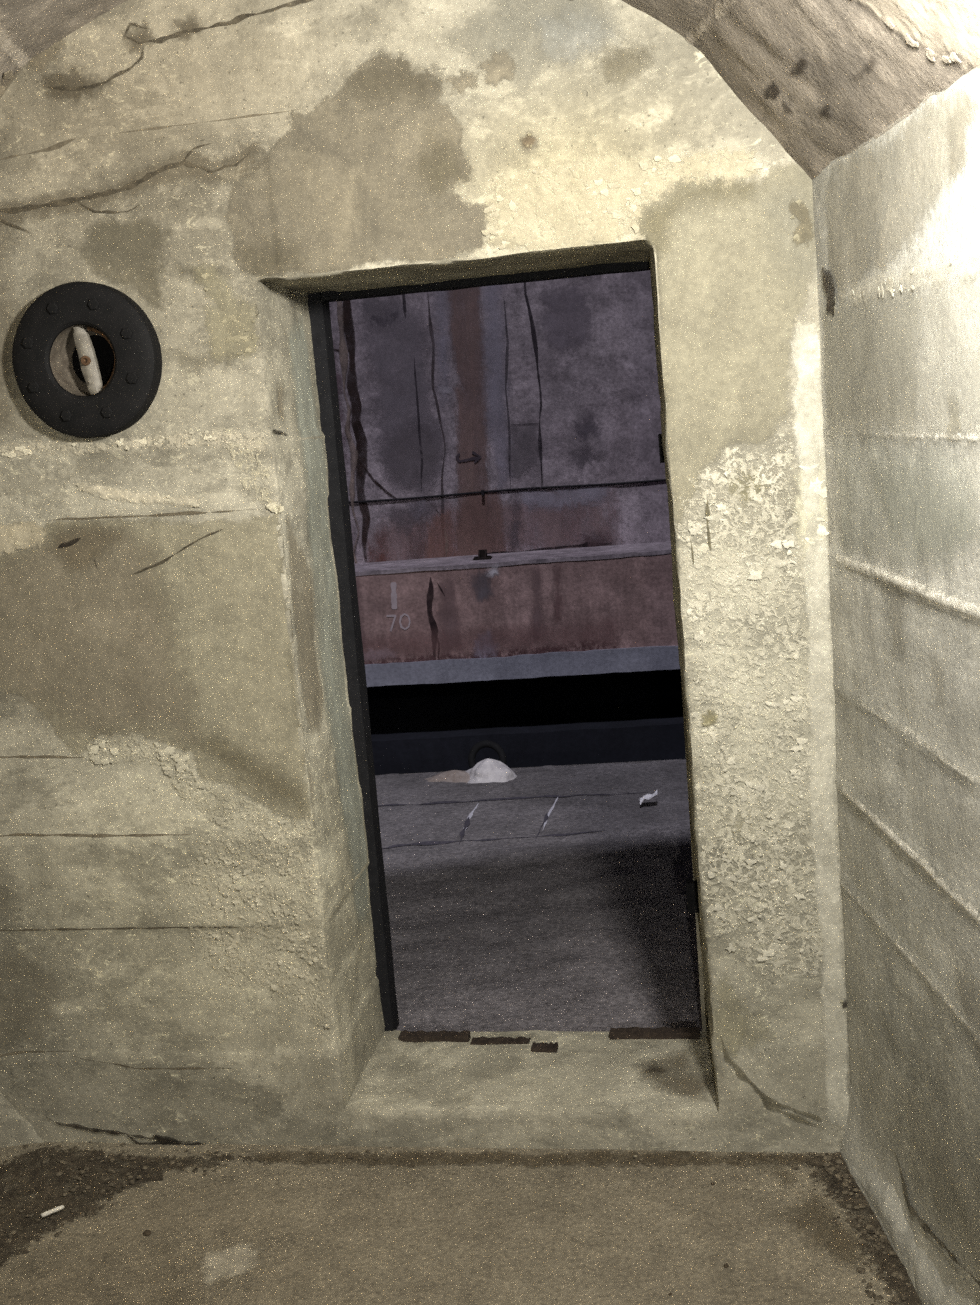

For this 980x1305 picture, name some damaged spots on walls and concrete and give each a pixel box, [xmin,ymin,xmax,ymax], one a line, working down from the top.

crack [52,0,312,91]
damp [128,0,606,276]
crack [0,143,248,233]
crack [334,282,611,658]
damp [0,325,369,919]
corrosion [364,639,617,664]
crack [721,1038,824,1128]
crack [46,1117,204,1145]
crack [895,1153,980,1287]